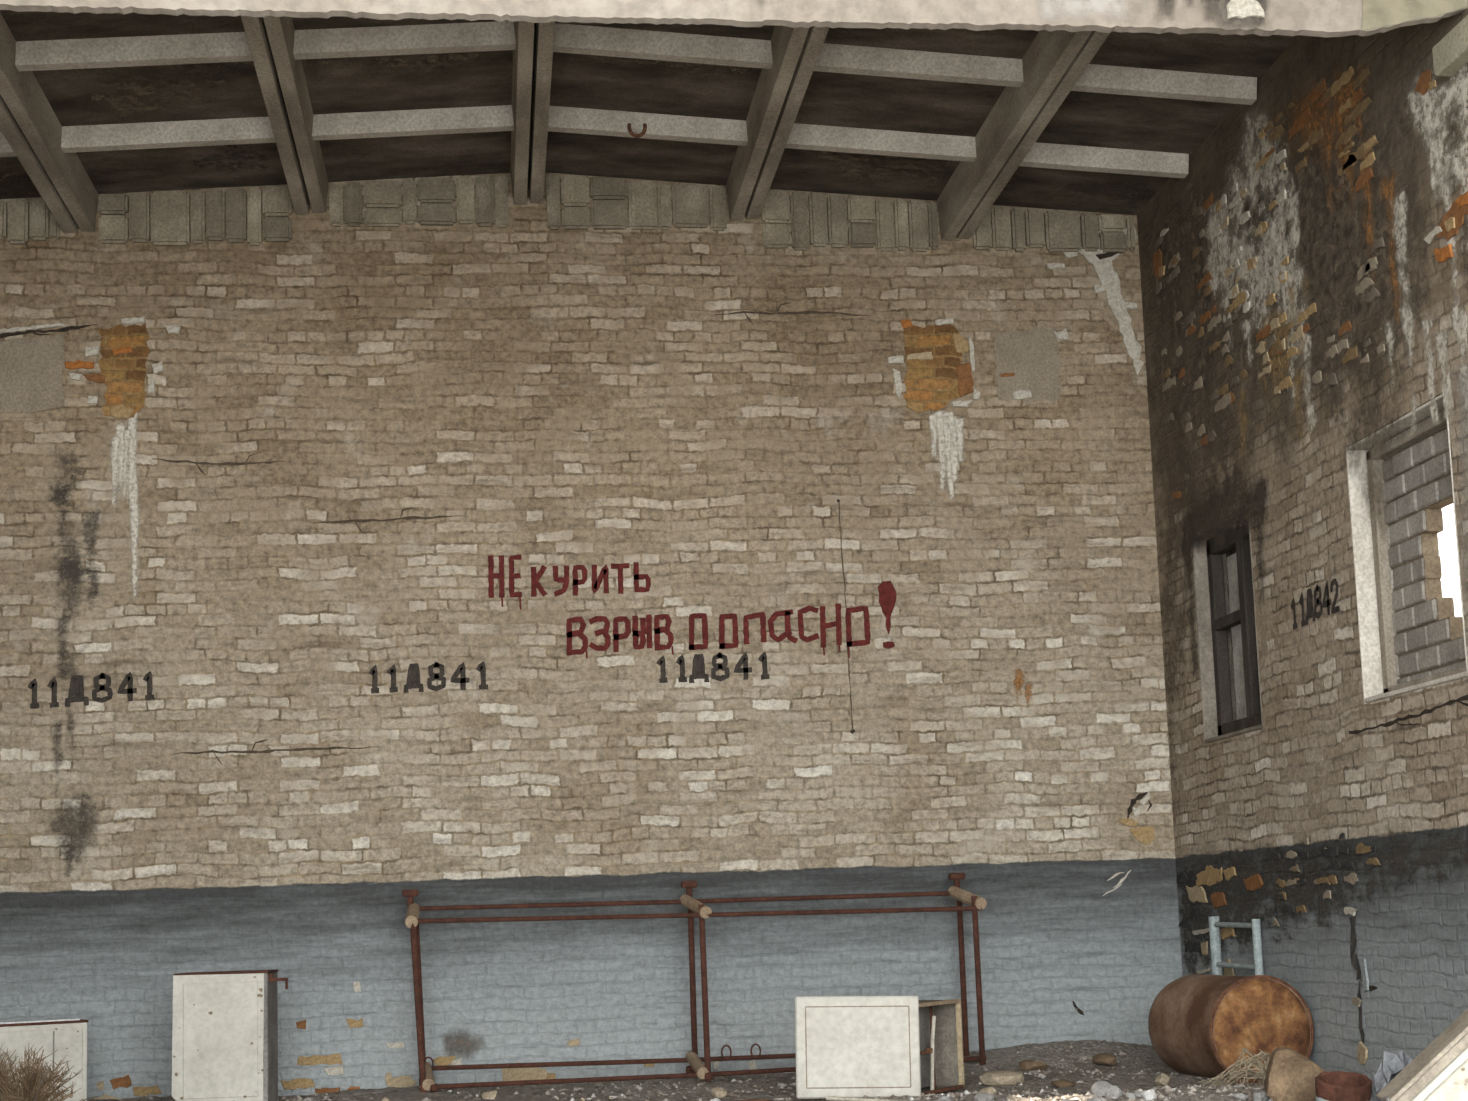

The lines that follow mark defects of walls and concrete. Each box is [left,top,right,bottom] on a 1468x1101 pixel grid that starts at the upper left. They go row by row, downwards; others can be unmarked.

damp [1206,0,1265,28]
spalling [1423,191,1468,263]
peeling [1355,237,1385,304]
spalling [65,316,164,419]
spalling [887,318,980,412]
peeling [1256,321,1385,386]
damp [929,411,964,498]
damp [111,413,138,596]
damp [84,514,98,594]
damp [57,617,75,678]
crack [1349,695,1468,734]
peeling [1176,832,1468,1065]